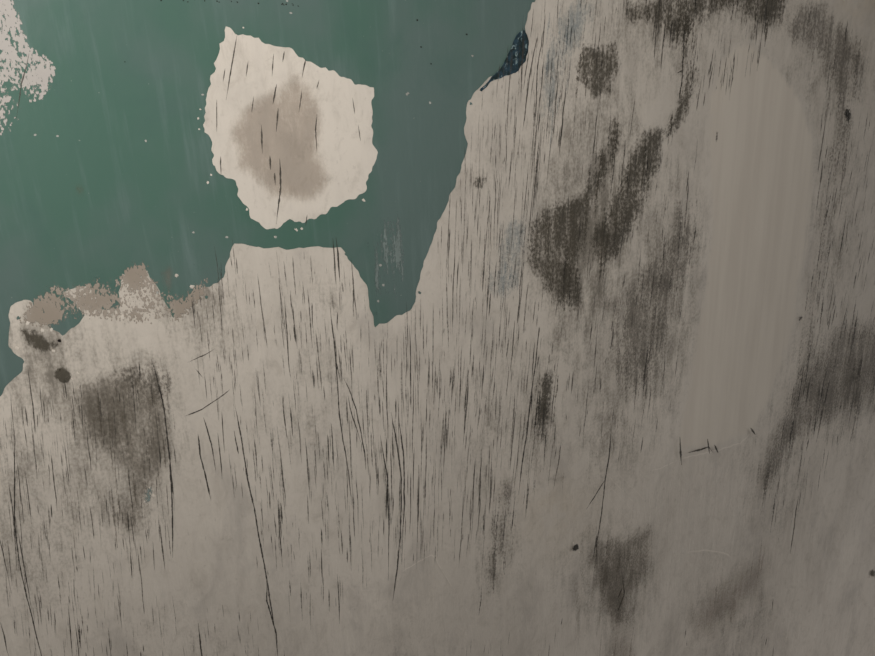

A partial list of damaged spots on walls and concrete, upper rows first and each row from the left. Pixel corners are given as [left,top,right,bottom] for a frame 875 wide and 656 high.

leakage [576,43,618,96]
leakage [626,0,785,57]
leakage [793,8,863,122]
peeling [0,0,535,396]
leakage [528,67,696,310]
leakage [83,364,170,445]
leakage [764,322,875,533]